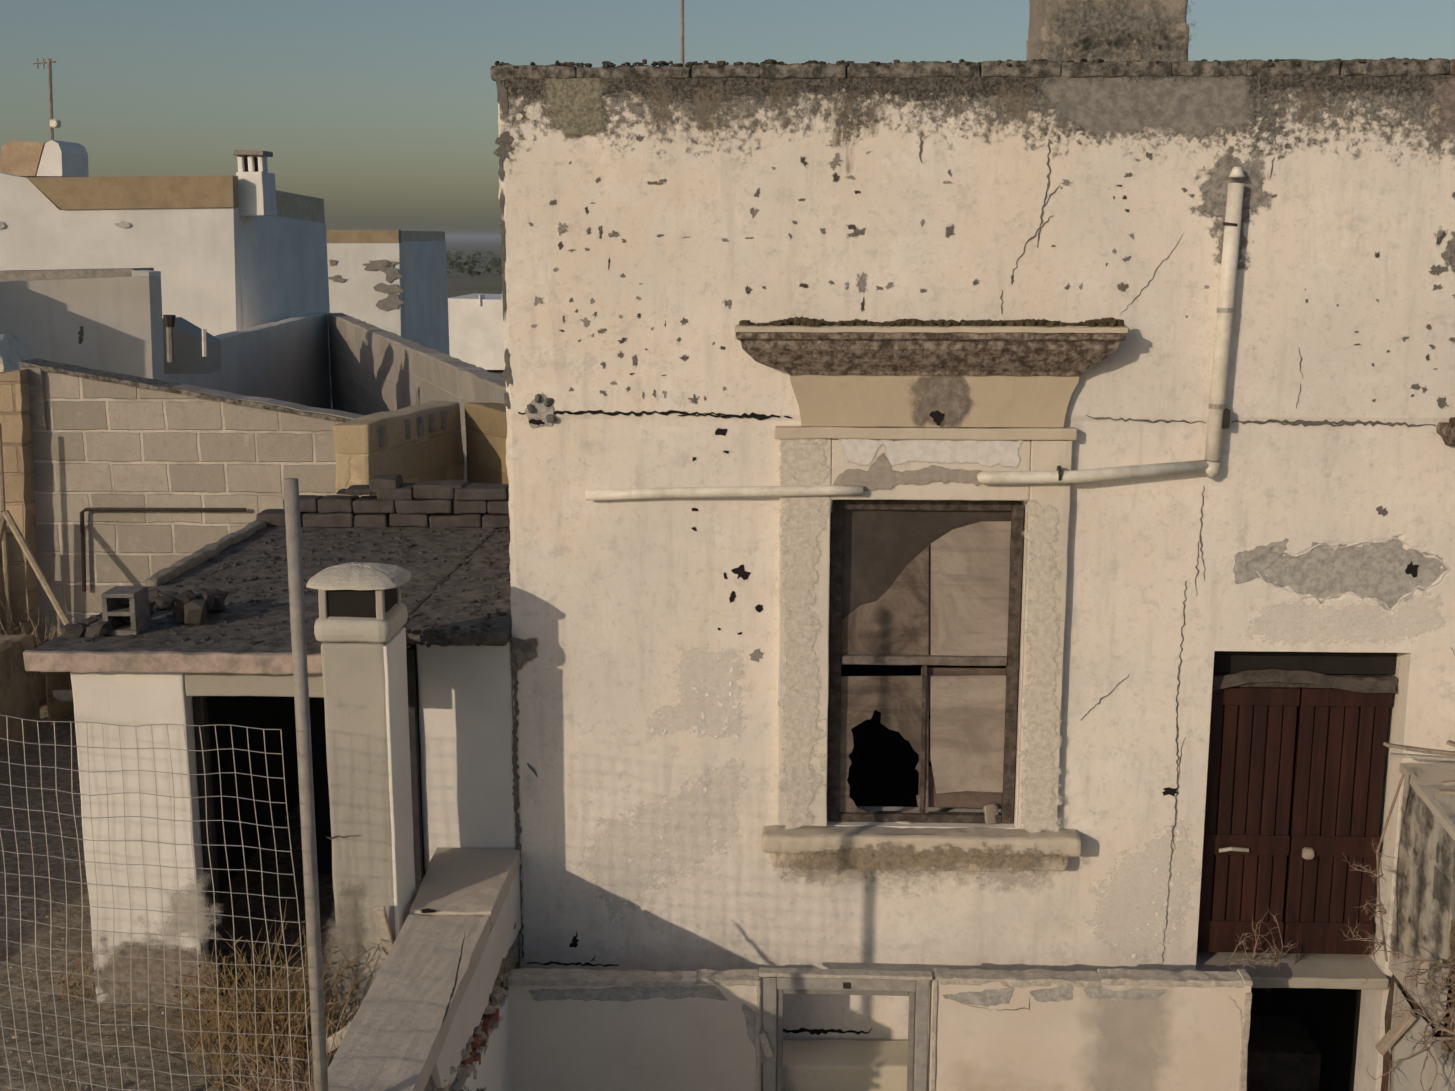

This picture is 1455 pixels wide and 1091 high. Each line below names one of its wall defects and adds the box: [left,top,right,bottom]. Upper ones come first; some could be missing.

leakage [499,78,550,161]
leakage [576,0,1455,160]
spalling [328,259,346,283]
spalling [363,260,405,311]
crack [1000,139,1060,313]
peeling [1113,152,1153,212]
spalling [1182,148,1277,270]
spalling [1429,230,1455,298]
peeling [1411,384,1449,409]
spalling [1233,536,1450,612]
crack [1162,488,1206,963]
crack [442,936,465,1024]